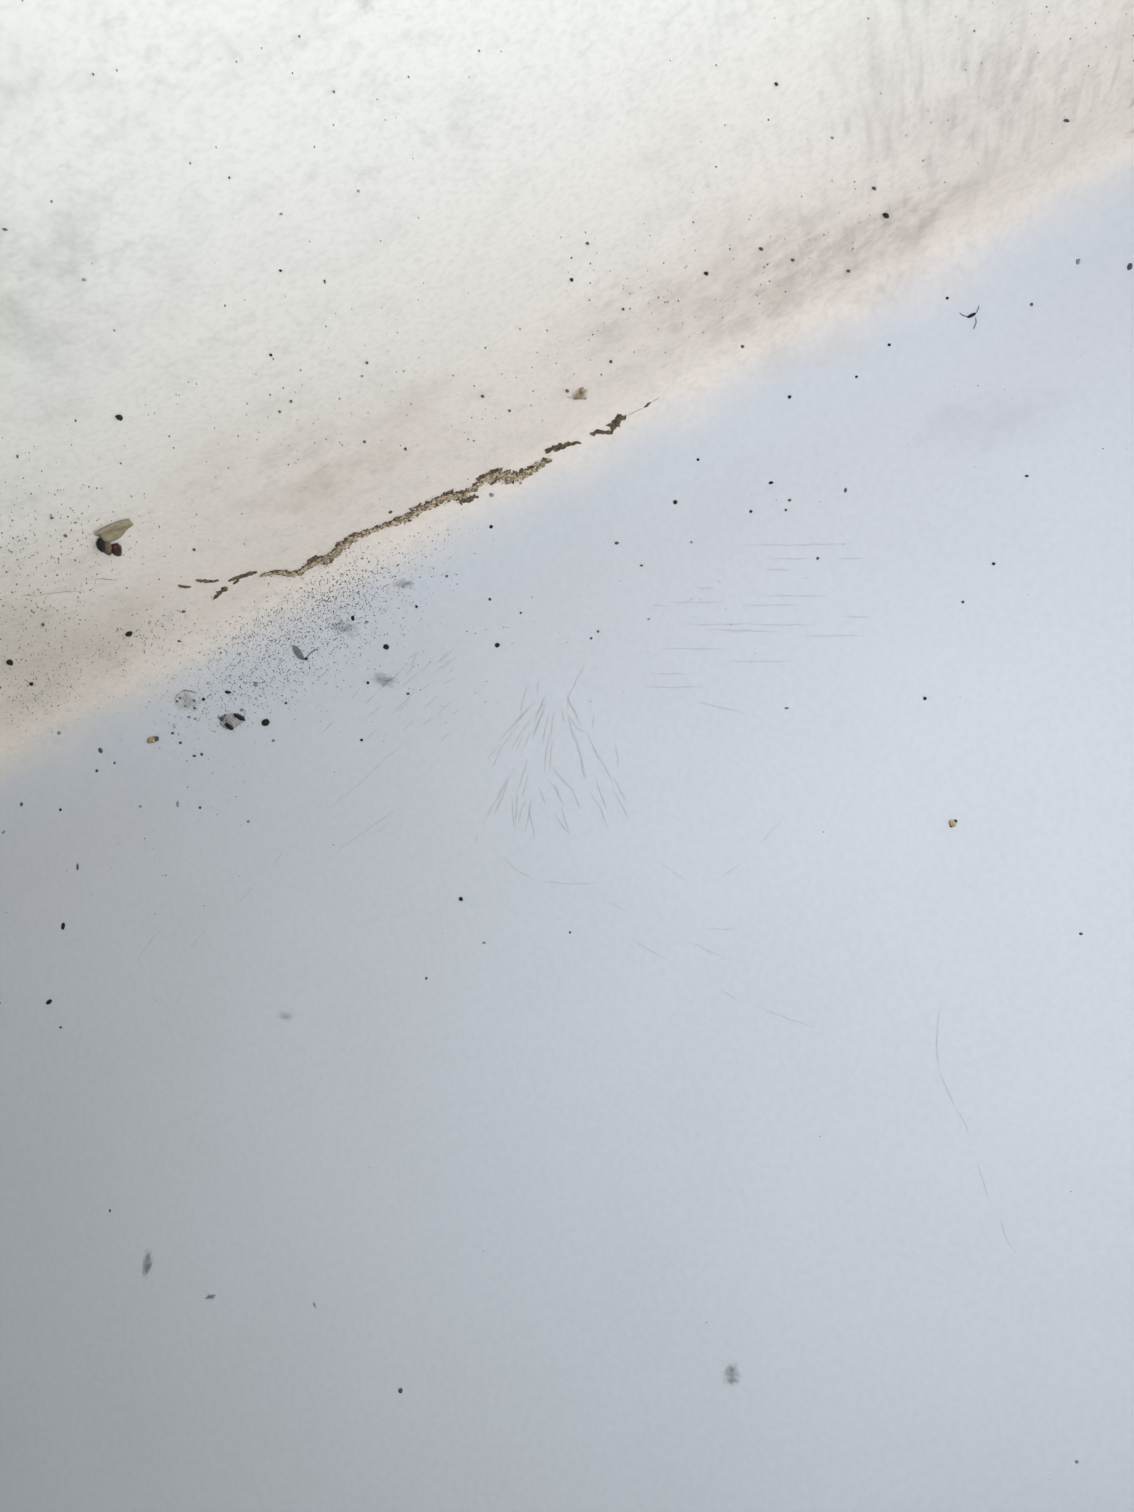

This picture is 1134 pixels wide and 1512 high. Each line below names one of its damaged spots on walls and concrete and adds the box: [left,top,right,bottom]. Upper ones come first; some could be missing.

crack [178,402,651,599]